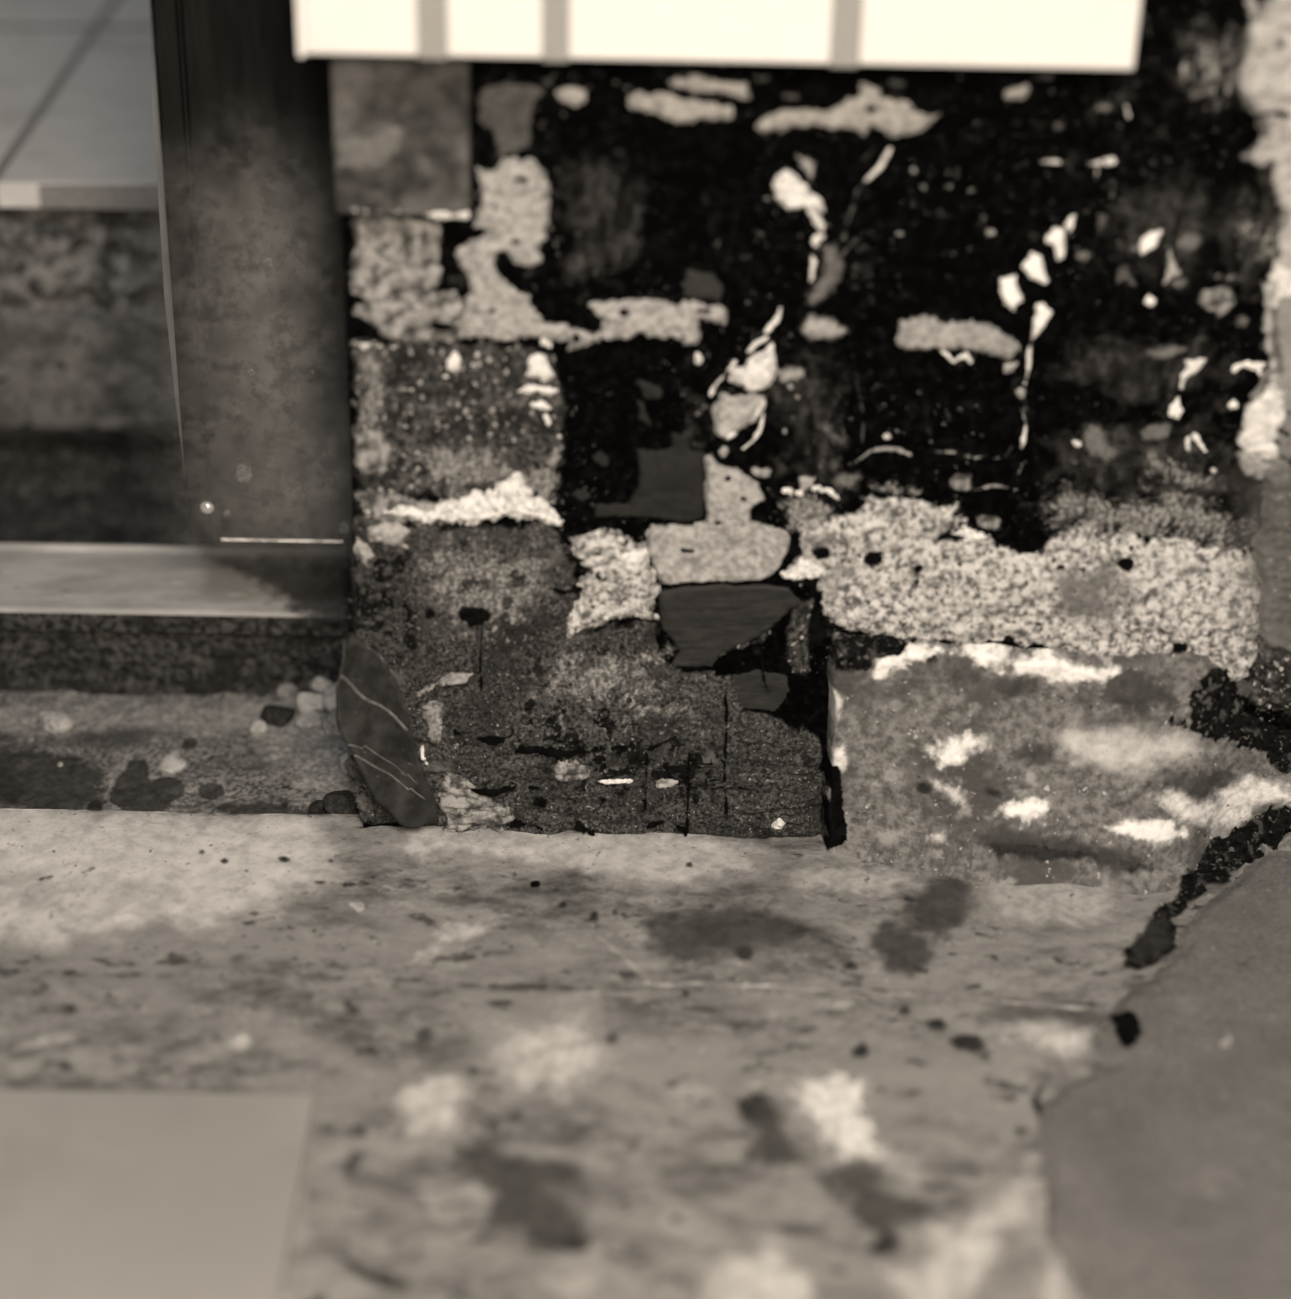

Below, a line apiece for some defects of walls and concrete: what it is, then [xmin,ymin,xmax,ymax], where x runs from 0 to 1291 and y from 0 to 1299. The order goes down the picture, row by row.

peeling [628,74,769,123]
peeling [756,79,939,138]
spalling [349,190,483,303]
peeling [766,157,843,304]
peeling [1000,215,1089,311]
damp [1178,234,1200,249]
damp [1199,275,1248,325]
damp [1024,335,1033,385]
spalling [575,307,799,525]
damp [751,468,771,477]
damp [779,476,840,533]
spalling [344,496,1291,839]